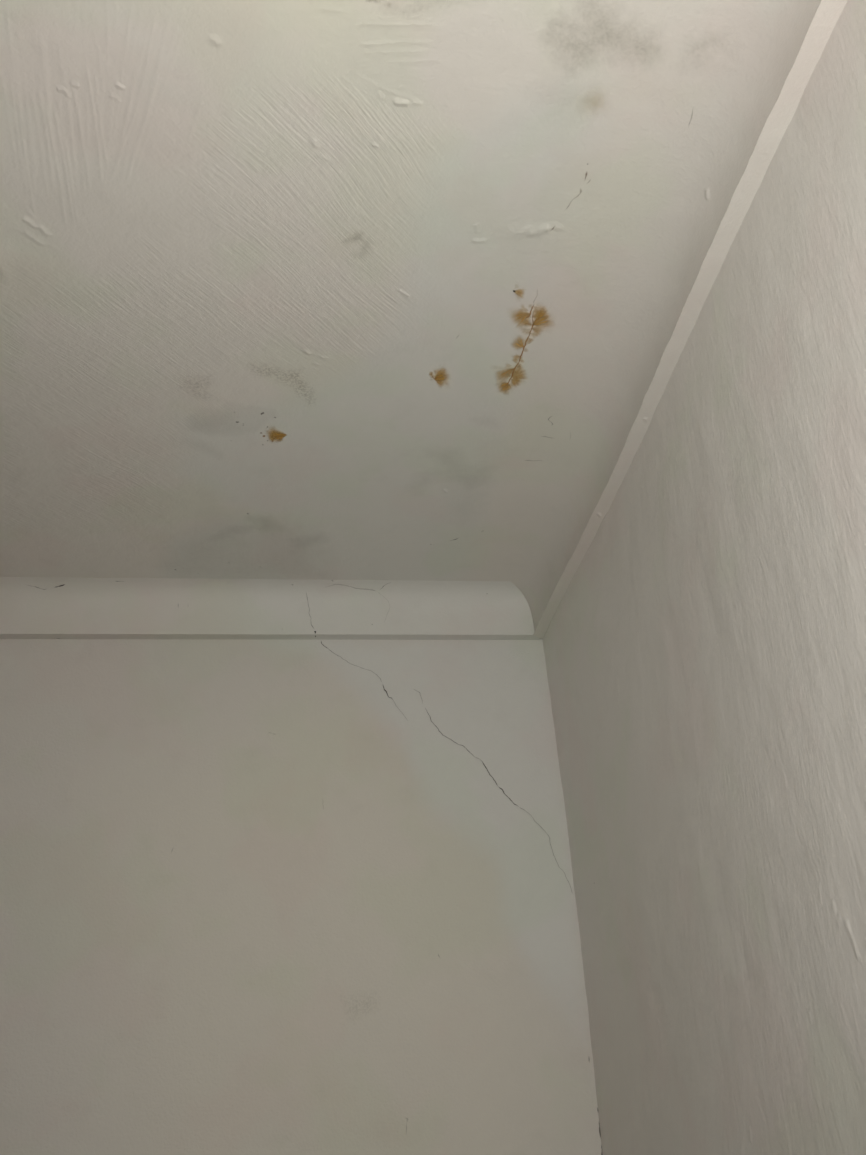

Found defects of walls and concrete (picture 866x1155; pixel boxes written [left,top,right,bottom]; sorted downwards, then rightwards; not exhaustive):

corrosion [501,305,547,390]
crack [427,712,516,805]